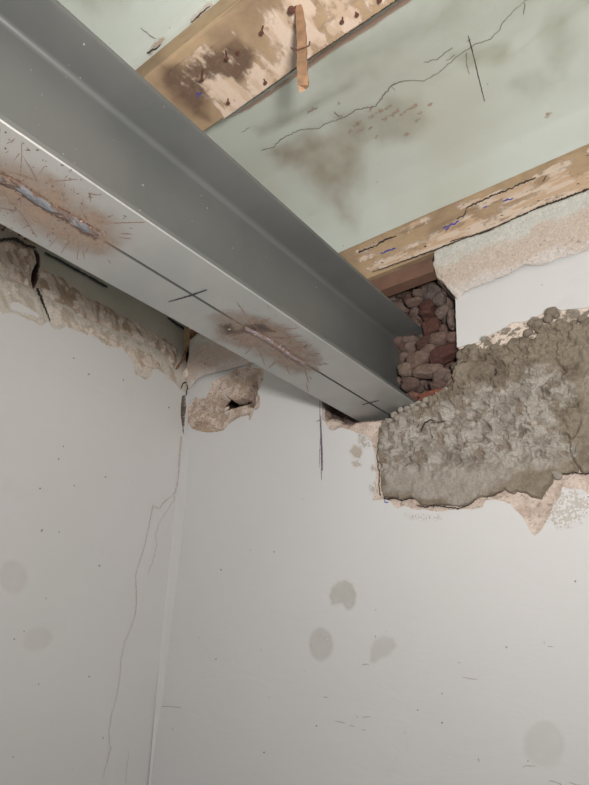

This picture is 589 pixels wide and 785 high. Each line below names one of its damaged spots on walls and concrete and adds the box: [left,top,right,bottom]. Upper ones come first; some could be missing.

crack [261,0,527,151]
peeling [355,160,589,272]
flaking render [0,224,188,387]
flaking render [188,364,264,433]
spalling [388,279,464,402]
peeling [476,321,537,349]
flaking render [322,401,589,535]
crack [102,382,188,785]